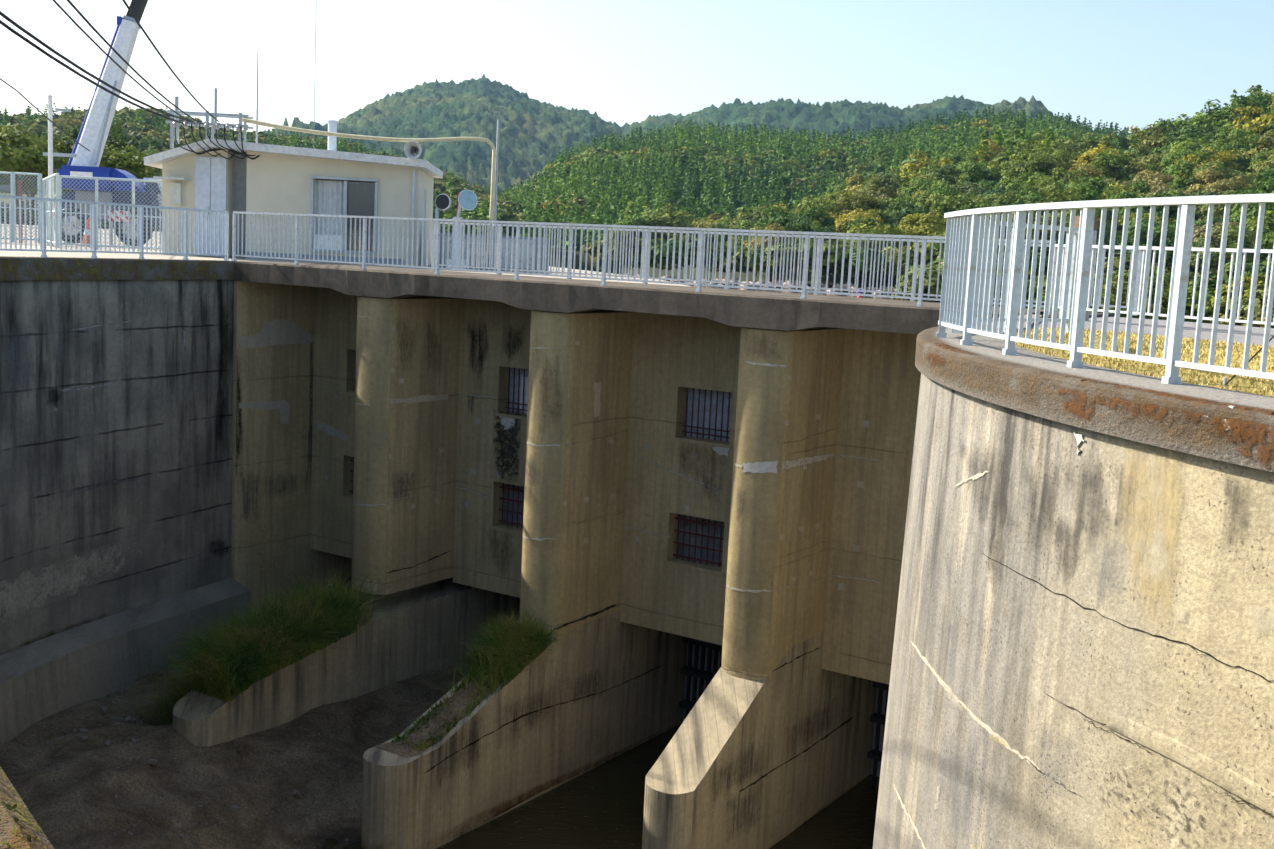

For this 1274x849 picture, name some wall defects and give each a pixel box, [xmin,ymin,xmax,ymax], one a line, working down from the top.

leakage [215,319,242,458]
rust [1058,375,1274,468]
leakage [1127,456,1179,600]
crack [982,553,1274,682]
crack [1046,694,1175,762]
crack [1214,786,1274,818]